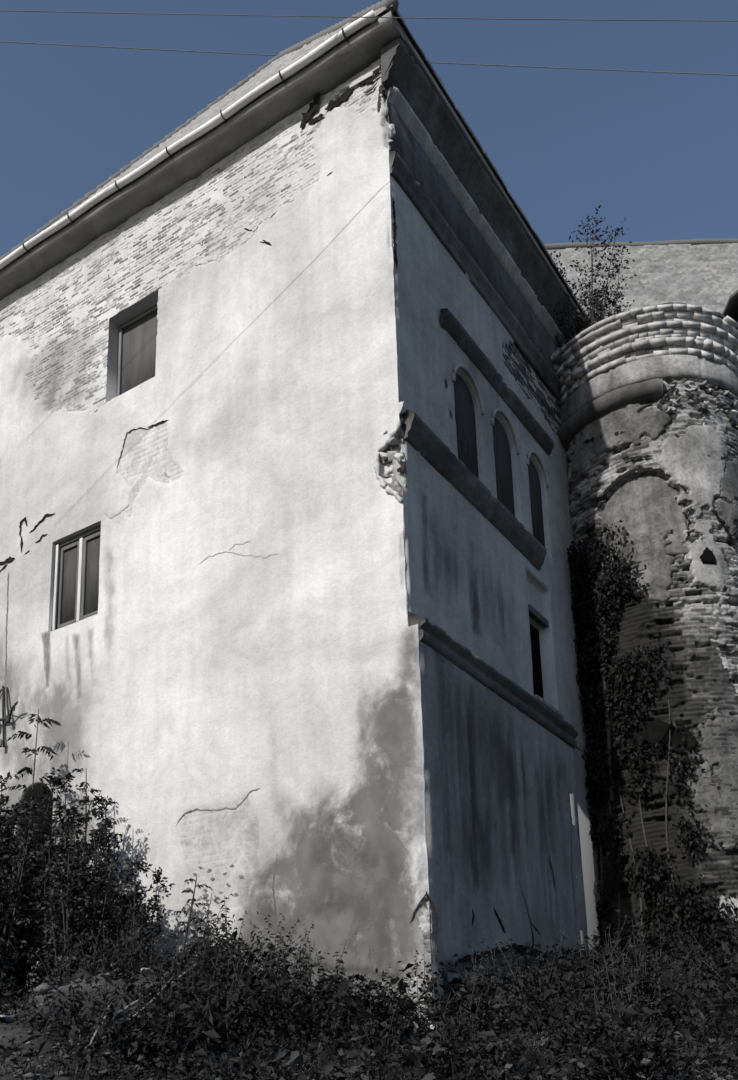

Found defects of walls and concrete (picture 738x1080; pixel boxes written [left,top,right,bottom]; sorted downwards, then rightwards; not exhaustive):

peeling [0,58,395,413]
peeling [116,420,183,517]
spalling [374,401,407,503]
spalling [656,376,738,429]
crack [199,541,279,564]
peeling [708,553,738,696]
damp [0,633,90,933]
damp [243,633,426,1006]
spalling [625,719,699,755]